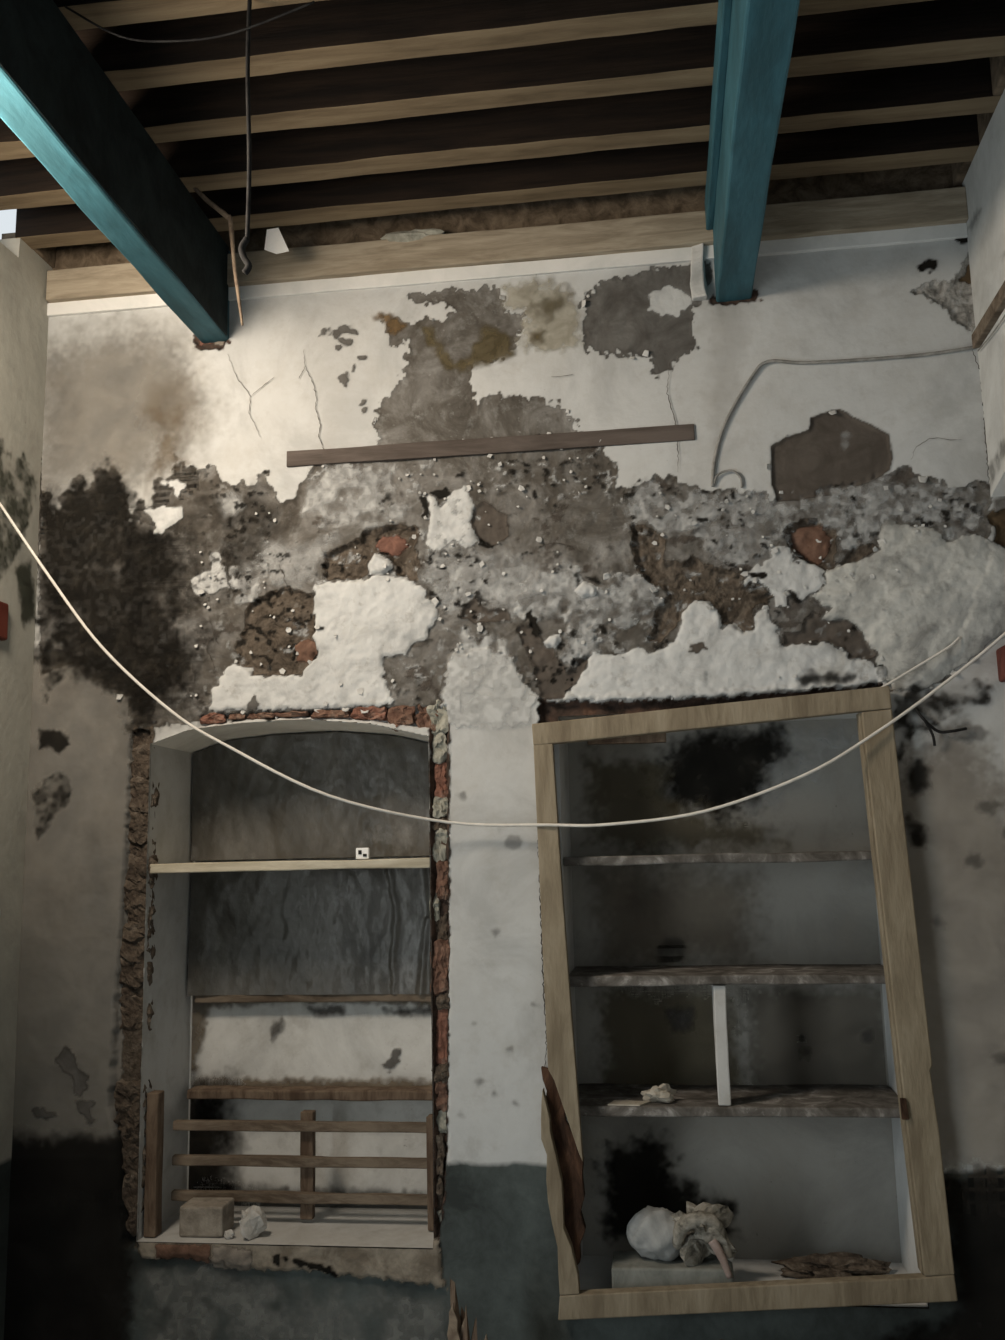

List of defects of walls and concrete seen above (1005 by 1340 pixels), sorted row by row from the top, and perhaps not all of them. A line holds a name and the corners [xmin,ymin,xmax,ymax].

flaking render [193,335,231,350]
crack [228,351,324,449]
peeling [321,325,367,387]
peeling [359,284,582,445]
peeling [578,243,763,379]
flaking render [911,238,975,331]
leakage [0,344,267,1340]
flaking render [38,409,1005,1290]
leakage [885,1168,1005,1340]